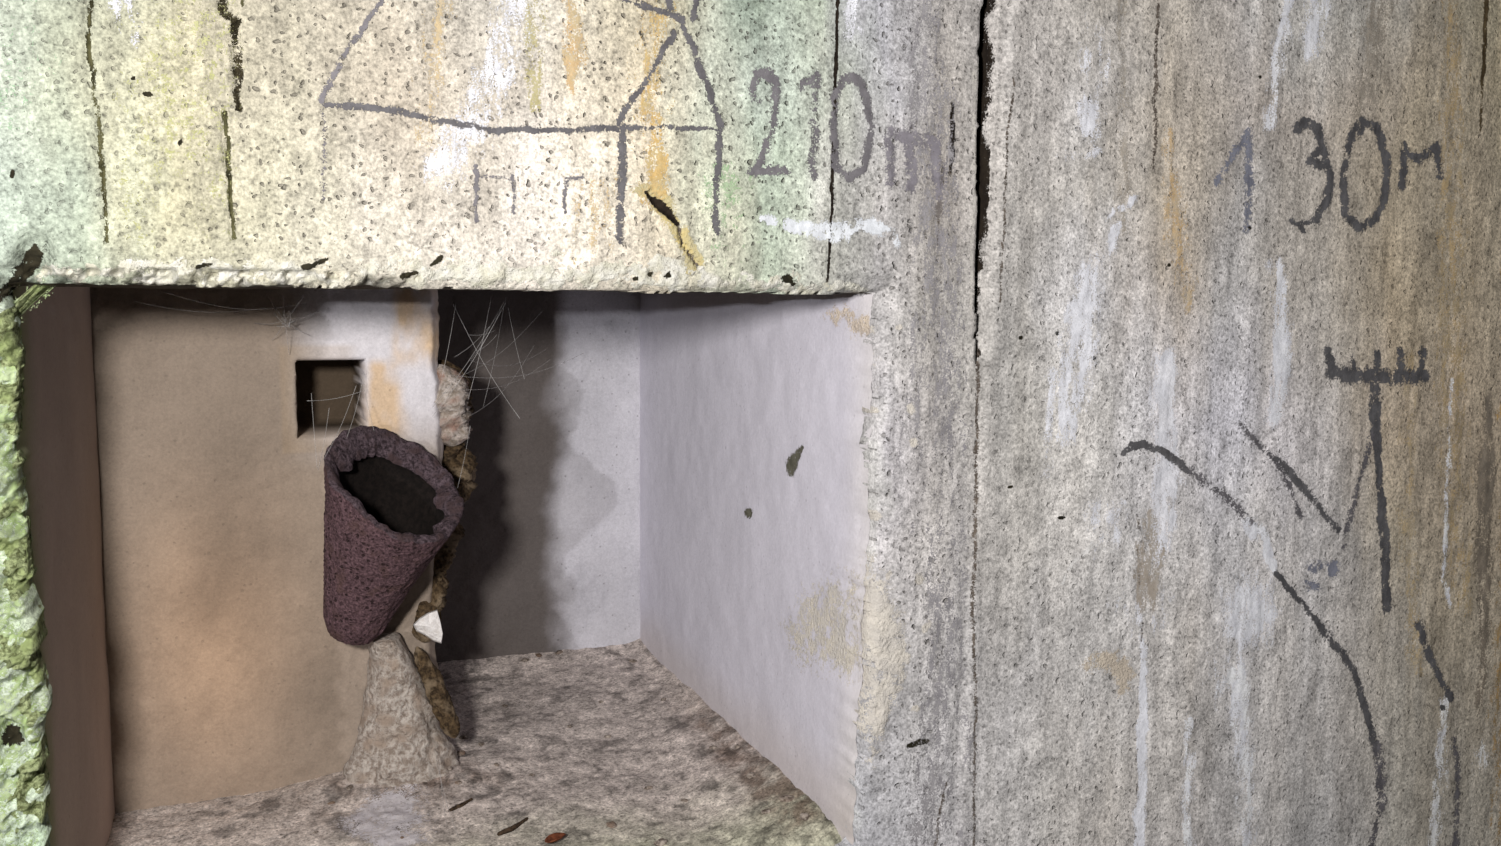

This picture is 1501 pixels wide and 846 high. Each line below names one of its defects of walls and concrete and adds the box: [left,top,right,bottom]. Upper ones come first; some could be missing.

crack [85,0,109,246]
crack [214,0,244,240]
corrosion [563,166,618,265]
corrosion [626,1,677,213]
damp [1040,0,1138,479]
damp [1261,0,1333,135]
crack [1479,0,1489,132]
crack [933,0,1015,846]
damp [1082,345,1186,846]
damp [1202,515,1283,846]
damp [1427,695,1451,846]
damp [1470,391,1499,714]